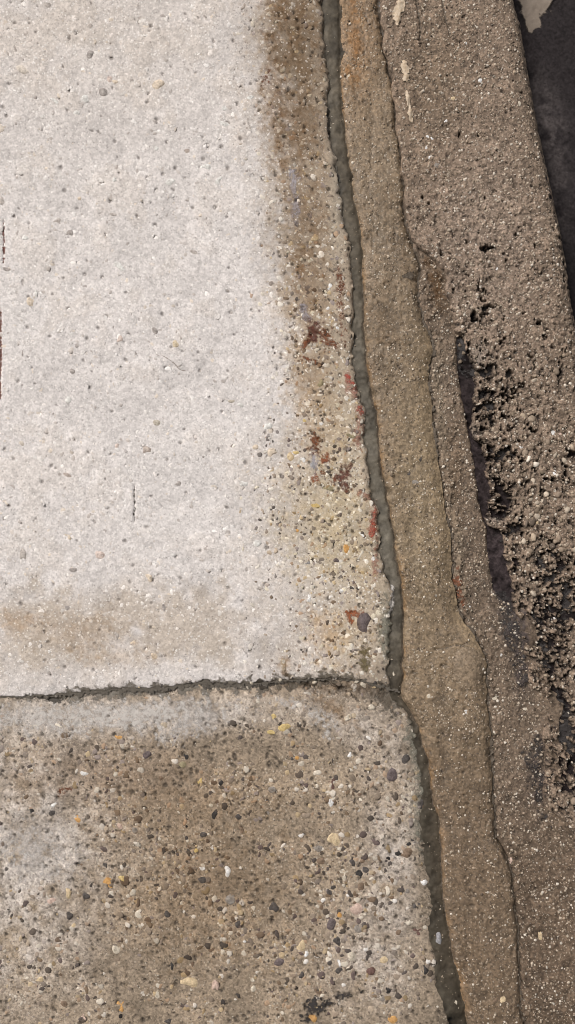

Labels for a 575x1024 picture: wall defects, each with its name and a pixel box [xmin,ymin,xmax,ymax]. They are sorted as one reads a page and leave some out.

spalling [456,337,513,424]
rust [306,432,352,493]
spalling [490,448,515,465]
crack [376,0,525,1022]
spalling [493,513,521,542]
crack [0,238,467,1023]
spalling [530,550,575,669]
spalling [556,688,575,767]